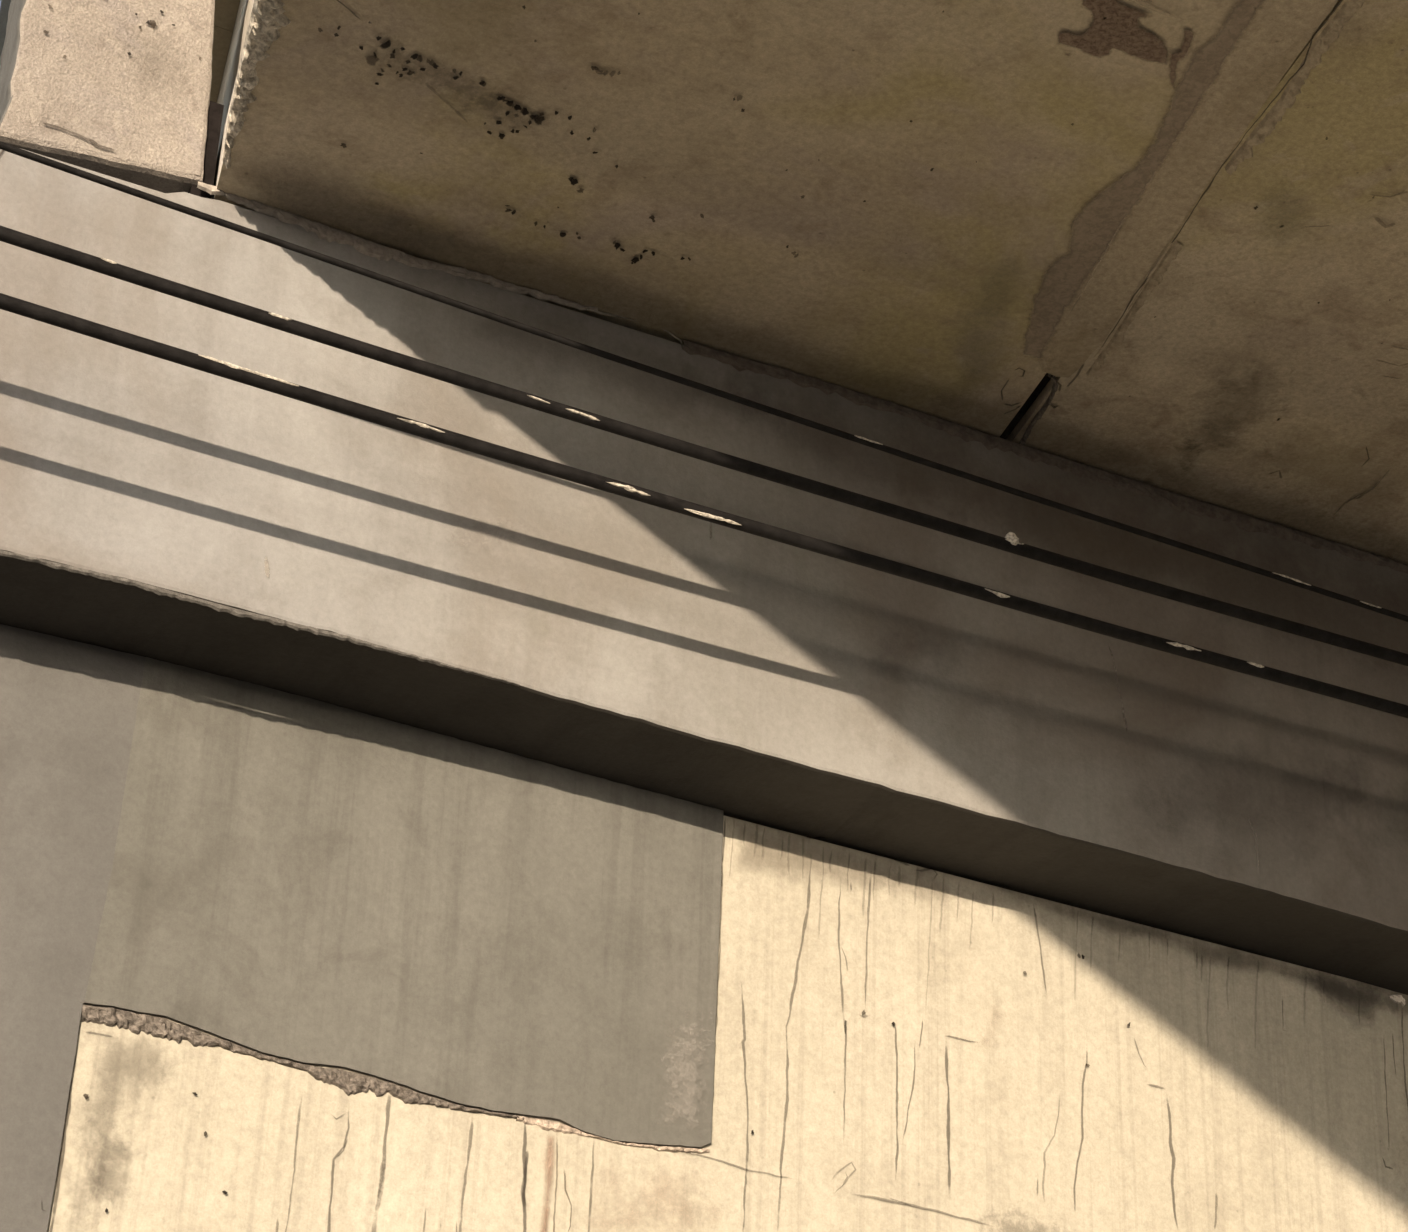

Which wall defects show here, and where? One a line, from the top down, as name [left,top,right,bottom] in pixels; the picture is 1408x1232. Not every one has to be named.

spalling [222,0,291,169]
damp [1024,0,1264,358]
crack [1001,0,1343,414]
crack [157,1016,629,1232]
spalling [81,1005,710,1154]
crack [895,1023,974,1185]
crack [1074,1061,1087,1199]
spalling [1390,994,1405,1006]